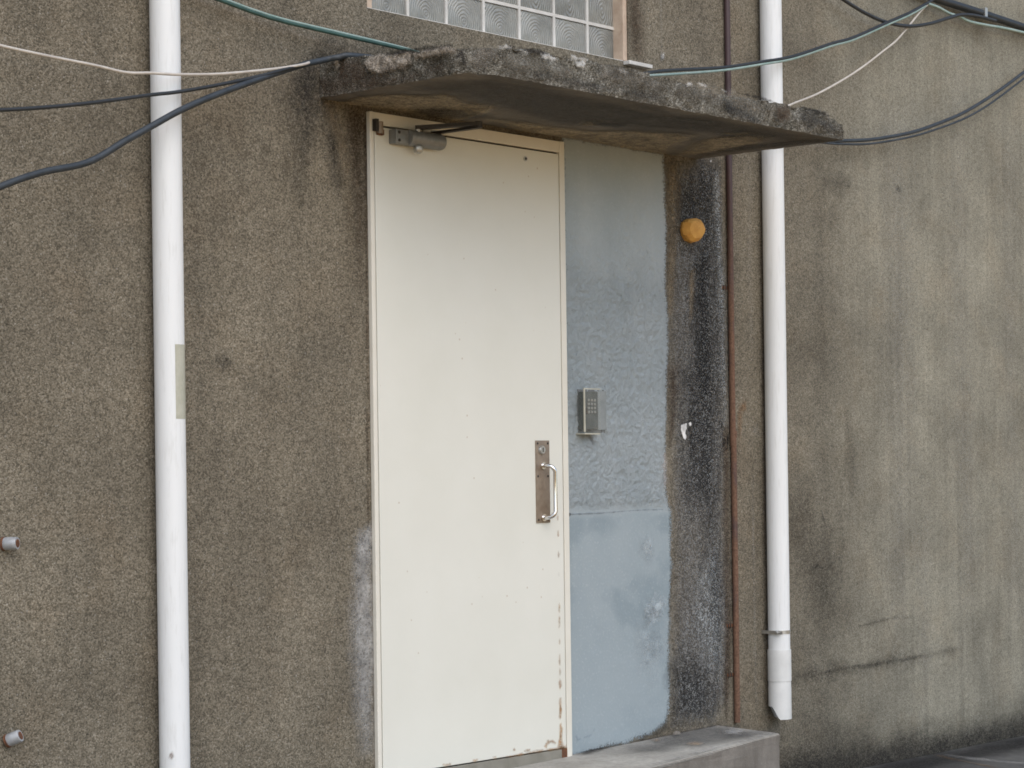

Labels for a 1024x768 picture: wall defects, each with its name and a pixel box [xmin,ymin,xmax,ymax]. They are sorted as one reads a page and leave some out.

water stain [308,61,809,717]